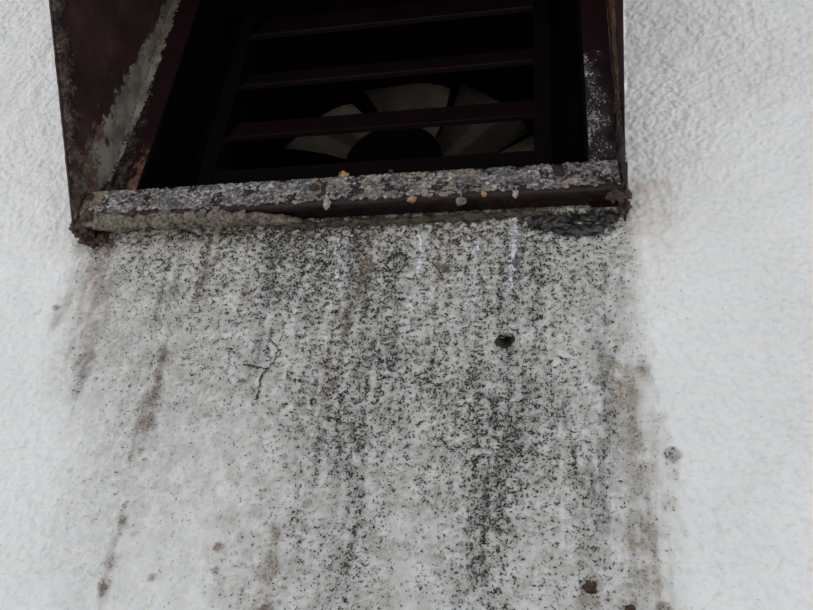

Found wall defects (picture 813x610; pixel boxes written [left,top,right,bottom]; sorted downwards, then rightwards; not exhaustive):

corrosion [71,0,622,215]
corrosion [131,348,166,456]
corrosion [190,229,226,312]
crack [244,339,279,405]
leakage [64,204,663,610]
corrosion [600,357,675,605]